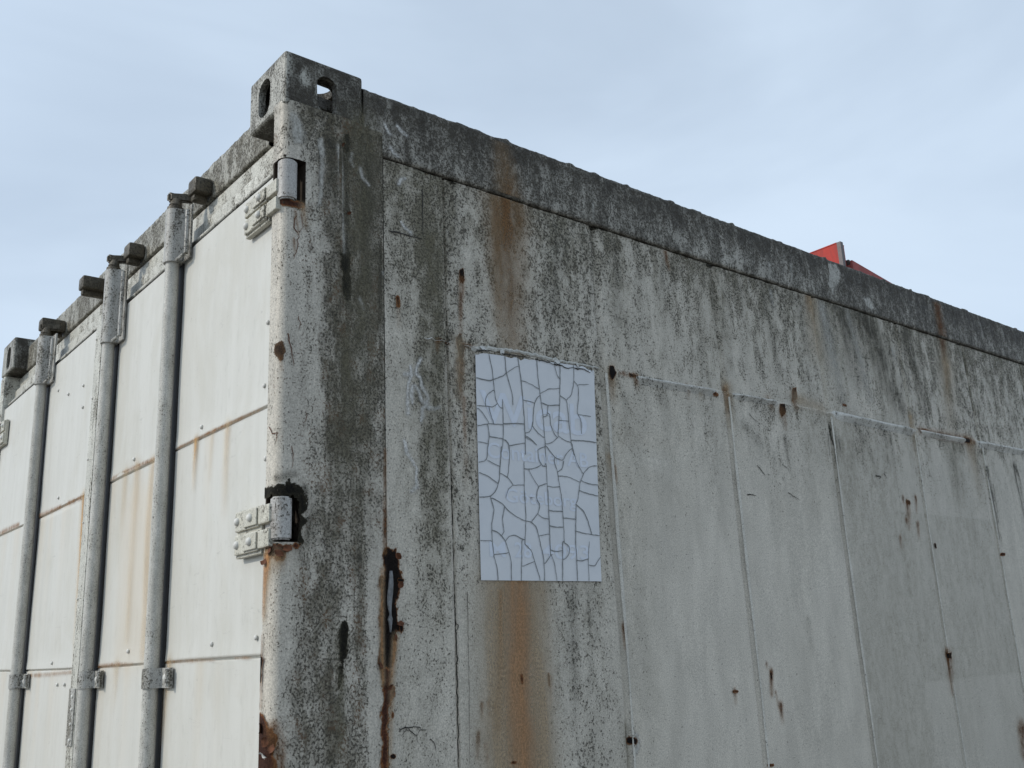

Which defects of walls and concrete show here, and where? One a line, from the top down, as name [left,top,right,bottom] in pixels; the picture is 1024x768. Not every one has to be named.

rust [274,340,286,361]
damp [819,263,900,410]
crack [403,337,601,581]
rust [260,542,301,612]
rust [258,643,284,768]
rust [477,580,551,768]